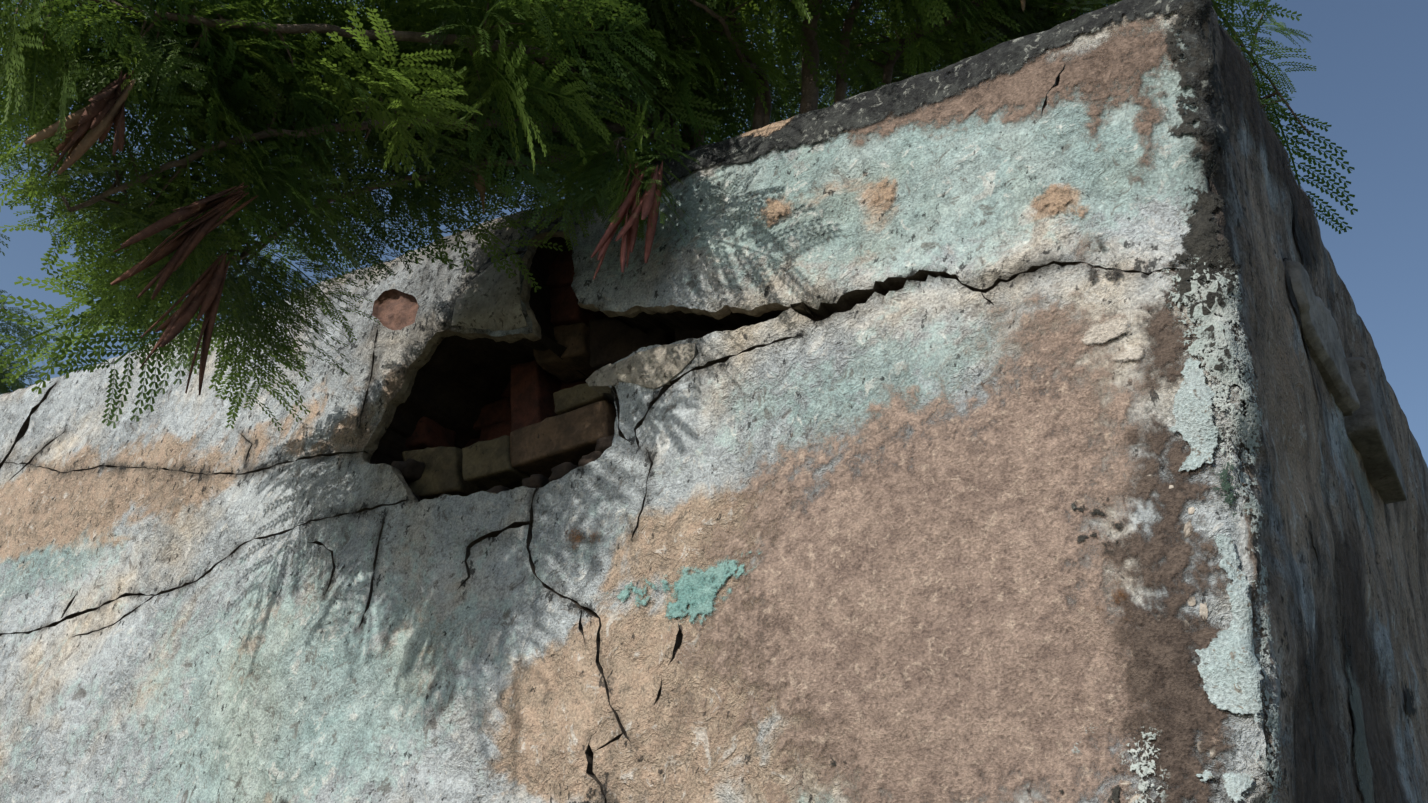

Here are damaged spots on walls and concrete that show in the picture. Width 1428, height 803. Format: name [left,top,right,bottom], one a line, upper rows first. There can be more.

crack [0,329,378,480]
spalling [372,289,419,330]
flaking render [402,250,736,499]
crack [611,261,1180,540]
crack [0,500,407,638]
crack [457,487,631,803]
crack [654,624,683,704]
water stain [1292,513,1409,803]